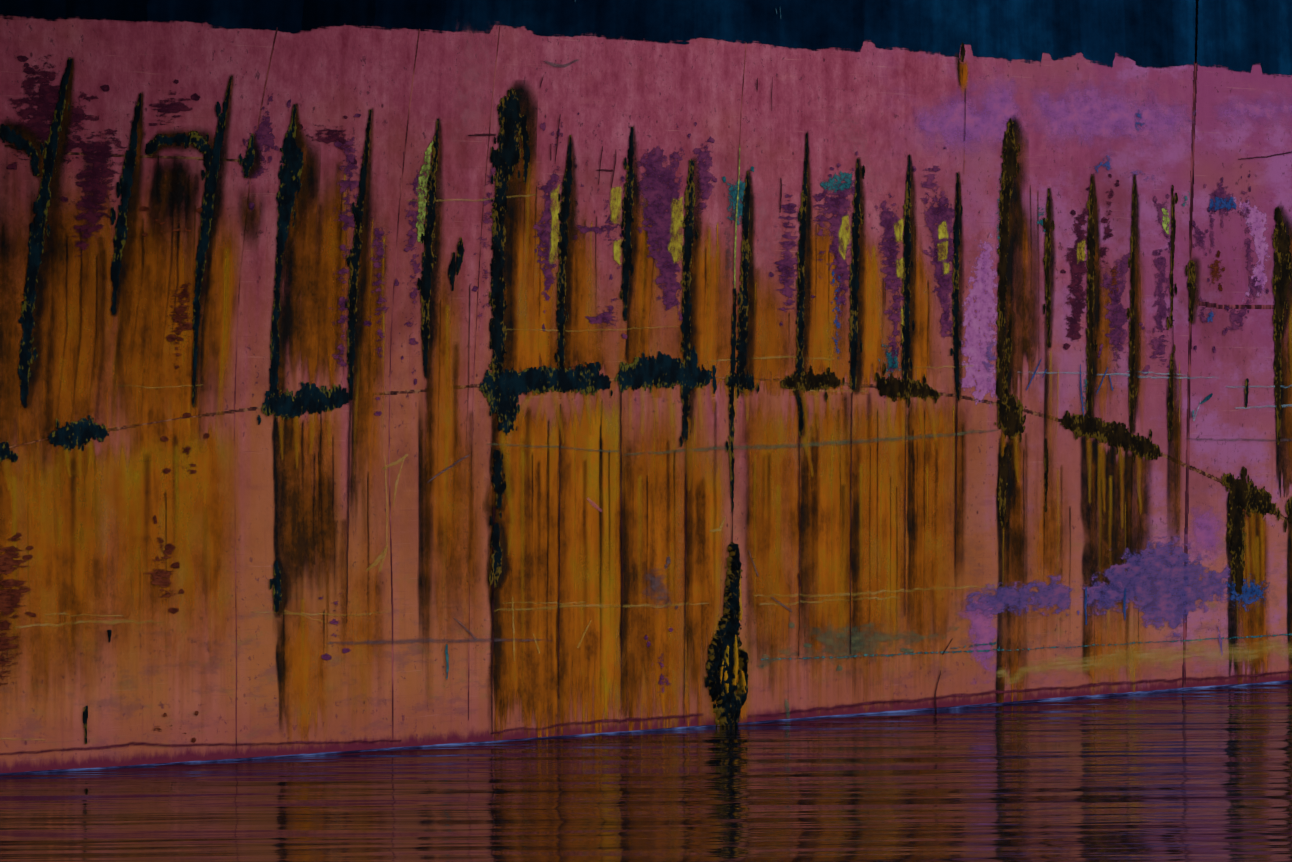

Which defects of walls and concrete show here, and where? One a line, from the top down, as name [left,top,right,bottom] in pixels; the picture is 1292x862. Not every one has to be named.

corrosion [0,57,261,663]
corrosion [257,104,386,735]
corrosion [417,83,963,740]
corrosion [994,118,1200,703]
corrosion [1222,206,1292,684]